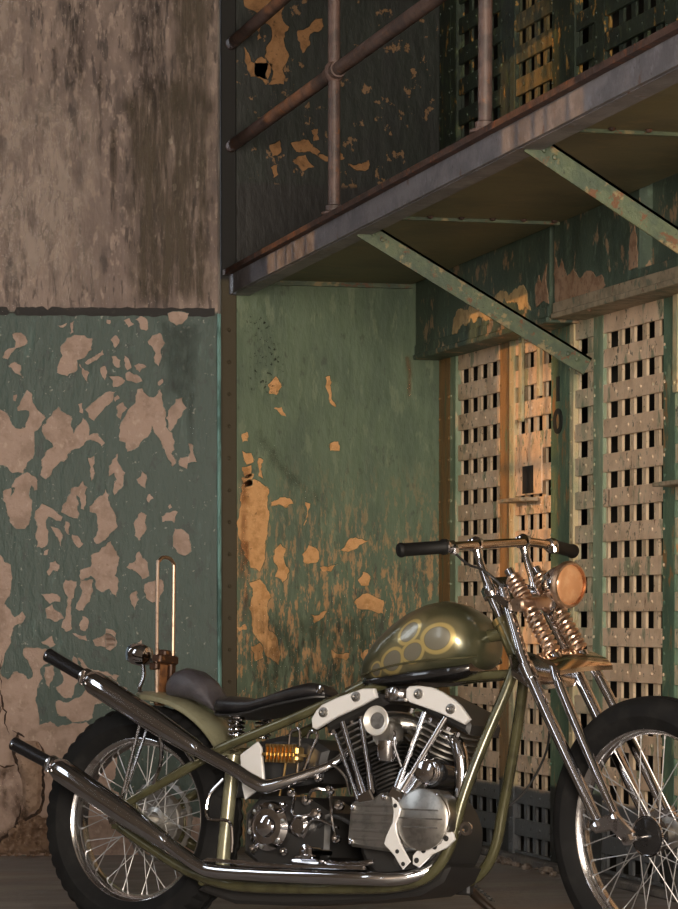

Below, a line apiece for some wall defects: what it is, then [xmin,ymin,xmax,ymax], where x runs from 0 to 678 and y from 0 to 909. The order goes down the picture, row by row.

peeling [244,6,324,85]
peeling [269,129,328,177]
peeling [494,257,605,310]
peeling [168,311,189,326]
peeling [452,306,492,335]
peeling [0,316,197,651]
peeling [237,432,294,665]
peeling [302,545,339,572]
peeling [354,571,385,614]
peeling [72,655,128,690]
peeling [0,555,103,856]
peeling [88,805,151,855]